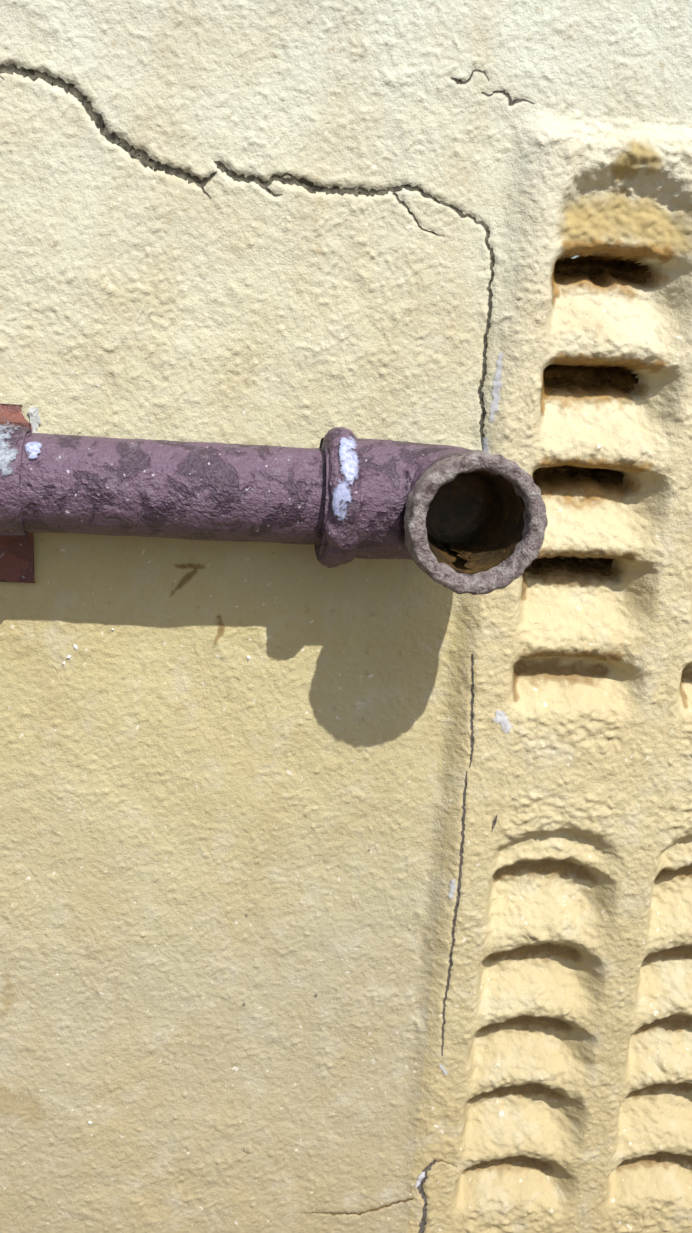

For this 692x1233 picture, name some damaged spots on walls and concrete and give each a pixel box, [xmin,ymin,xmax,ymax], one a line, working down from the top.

crack [0,63,495,451]
crack [451,69,535,105]
crack [441,654,497,1056]
crack [302,1160,458,1233]